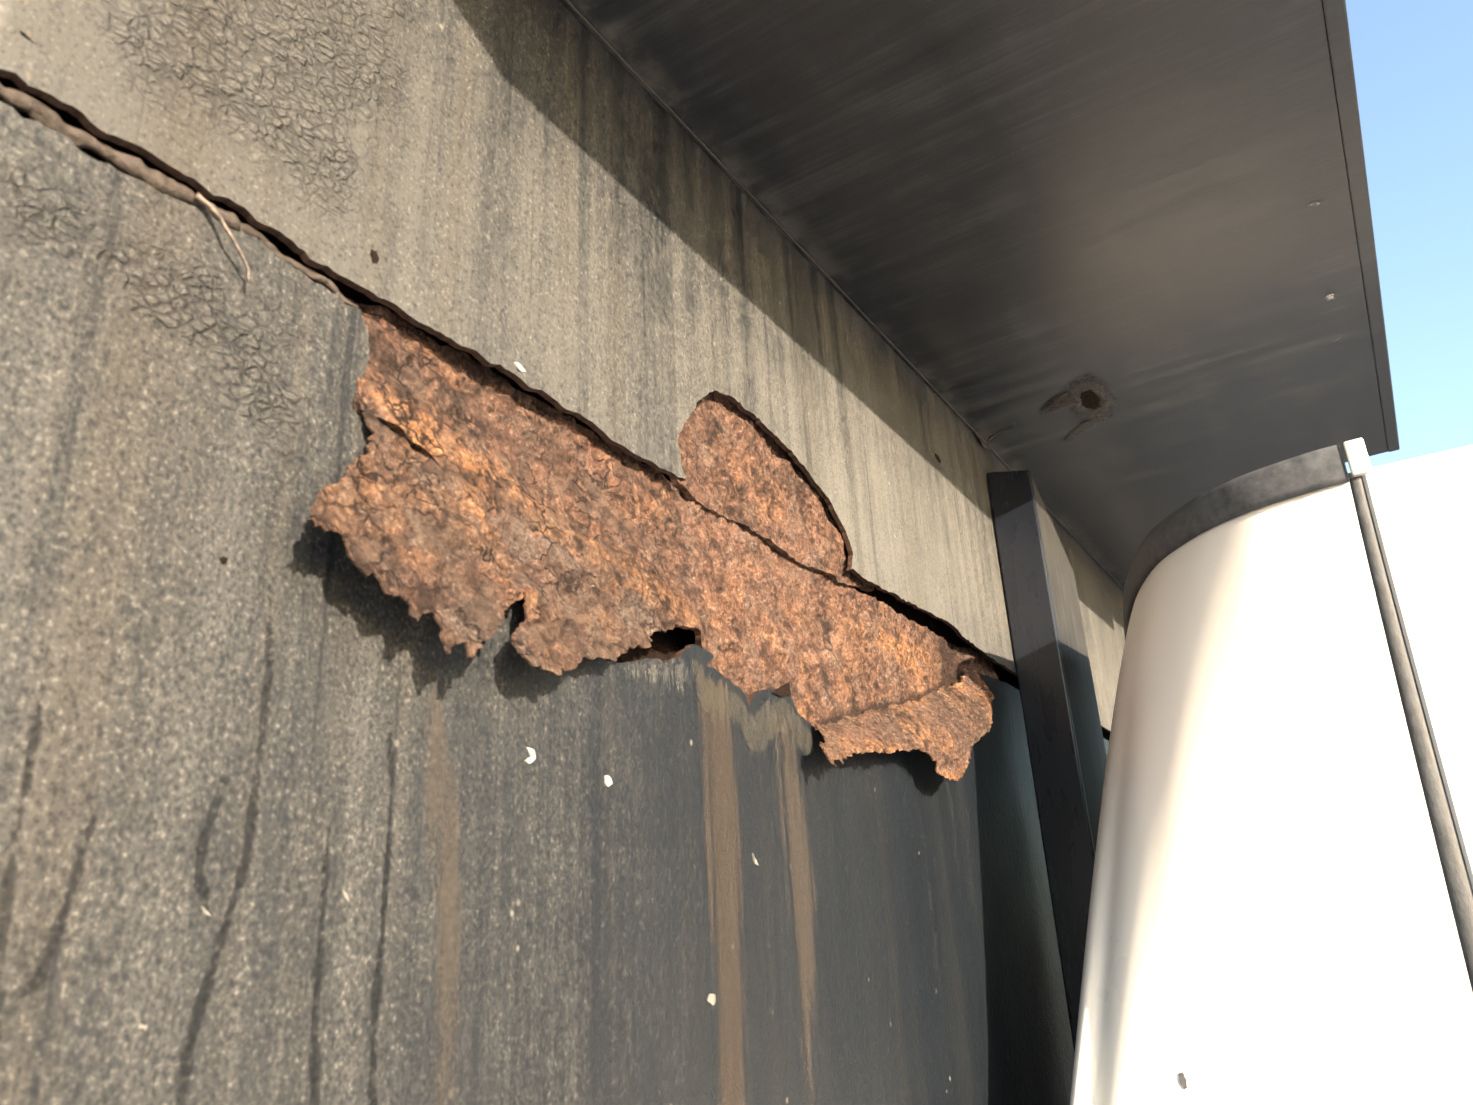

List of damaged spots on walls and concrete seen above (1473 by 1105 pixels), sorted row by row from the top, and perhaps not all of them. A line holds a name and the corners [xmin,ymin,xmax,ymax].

crack [0,77,601,438]
spalling [1080,390,1101,410]
rust [306,297,1000,781]
crack [853,587,1019,690]
crack [1102,729,1110,741]